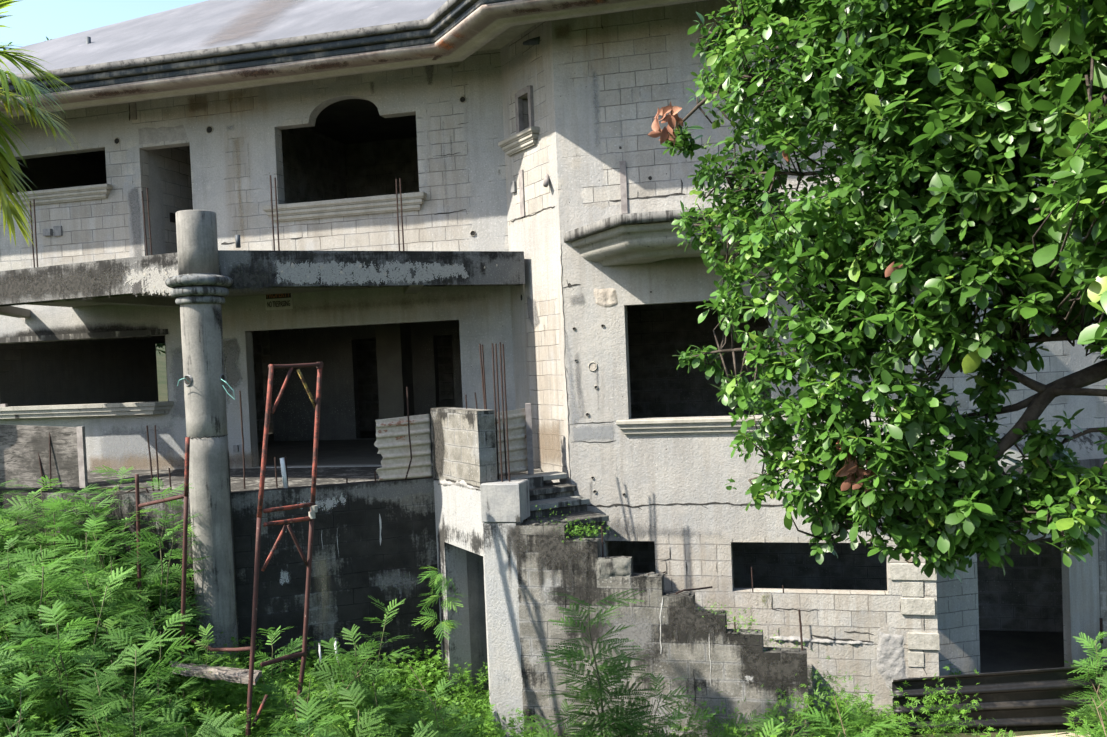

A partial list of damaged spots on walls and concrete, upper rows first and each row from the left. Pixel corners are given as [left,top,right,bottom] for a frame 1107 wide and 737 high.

corrosion [513,0,606,14]
corrosion [237,69,274,77]
corrosion [291,62,348,71]
peeling [270,175,469,286]
crack [561,250,798,510]
damp [298,492,346,512]
damp [507,526,595,590]
efflorescence [379,573,419,593]
damp [606,616,652,653]
damp [671,601,720,652]
damp [741,647,804,700]